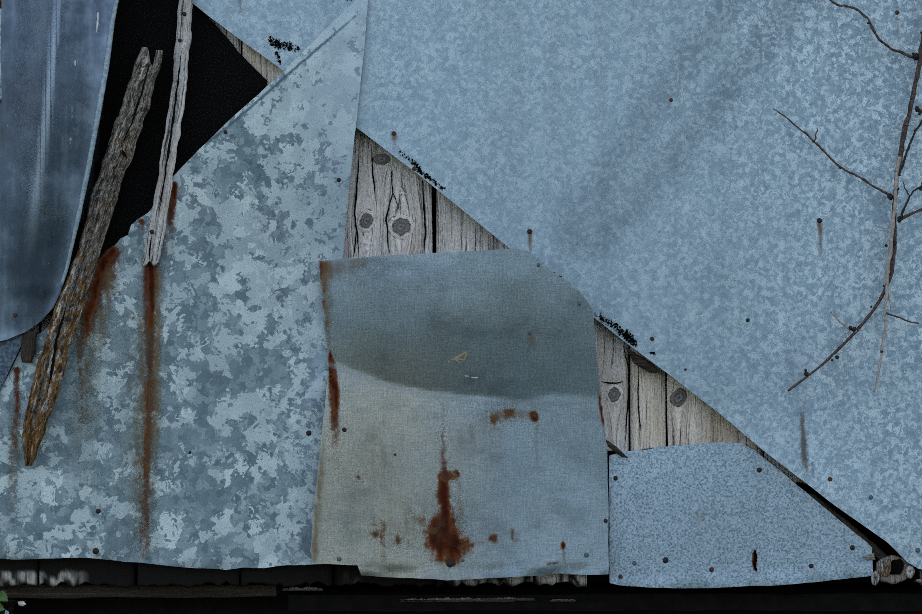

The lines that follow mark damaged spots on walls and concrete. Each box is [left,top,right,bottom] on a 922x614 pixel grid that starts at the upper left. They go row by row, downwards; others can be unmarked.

rust [76,246,121,409]
rust [11,366,20,451]
rust [139,262,161,555]
rust [328,350,340,438]
rust [491,408,539,424]
rust [420,443,474,567]